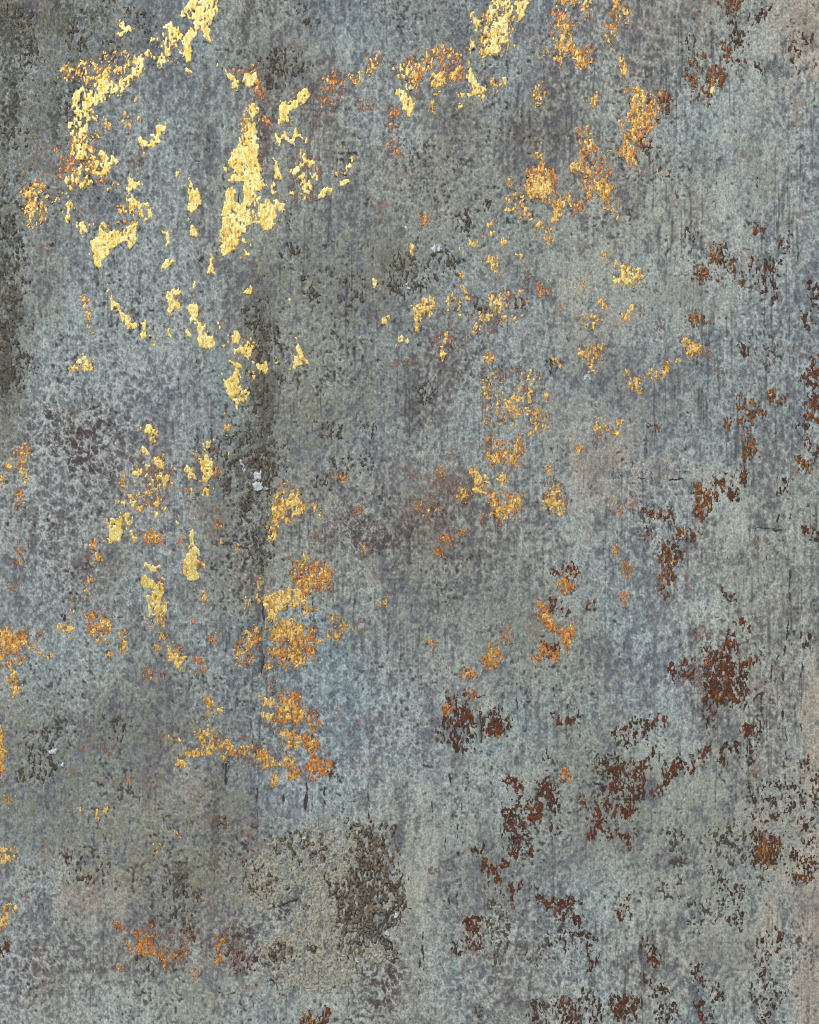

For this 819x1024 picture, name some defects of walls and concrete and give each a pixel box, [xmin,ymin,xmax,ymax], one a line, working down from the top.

rust [683,0,814,108]
rust [609,381,788,609]
rust [450,915,489,956]
rust [435,662,513,756]
rust [457,748,601,972]
rust [578,616,819,932]